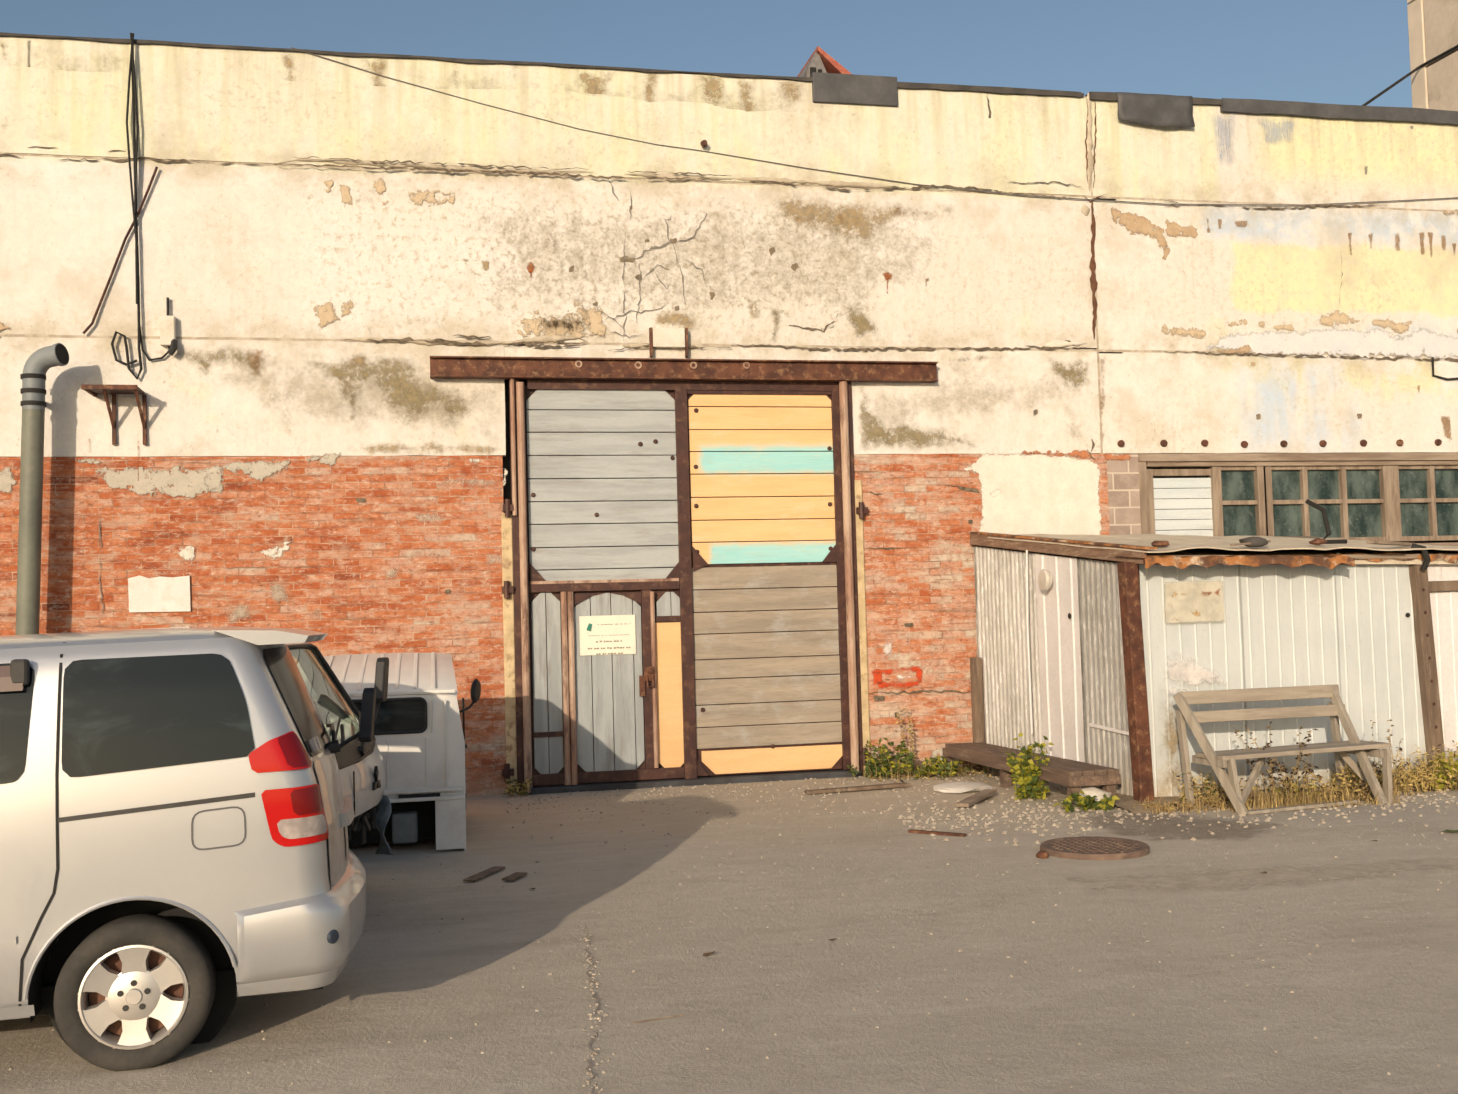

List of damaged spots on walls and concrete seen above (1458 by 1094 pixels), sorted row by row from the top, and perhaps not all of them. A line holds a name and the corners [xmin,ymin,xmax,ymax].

crack [0,98,1106,352]
peeling [1111,208,1198,260]
water stain [192,350,260,374]
spalling [313,300,353,327]
water stain [327,356,466,415]
peeling [517,301,606,342]
peeling [1161,310,1458,366]
rust [1118,552,1458,569]